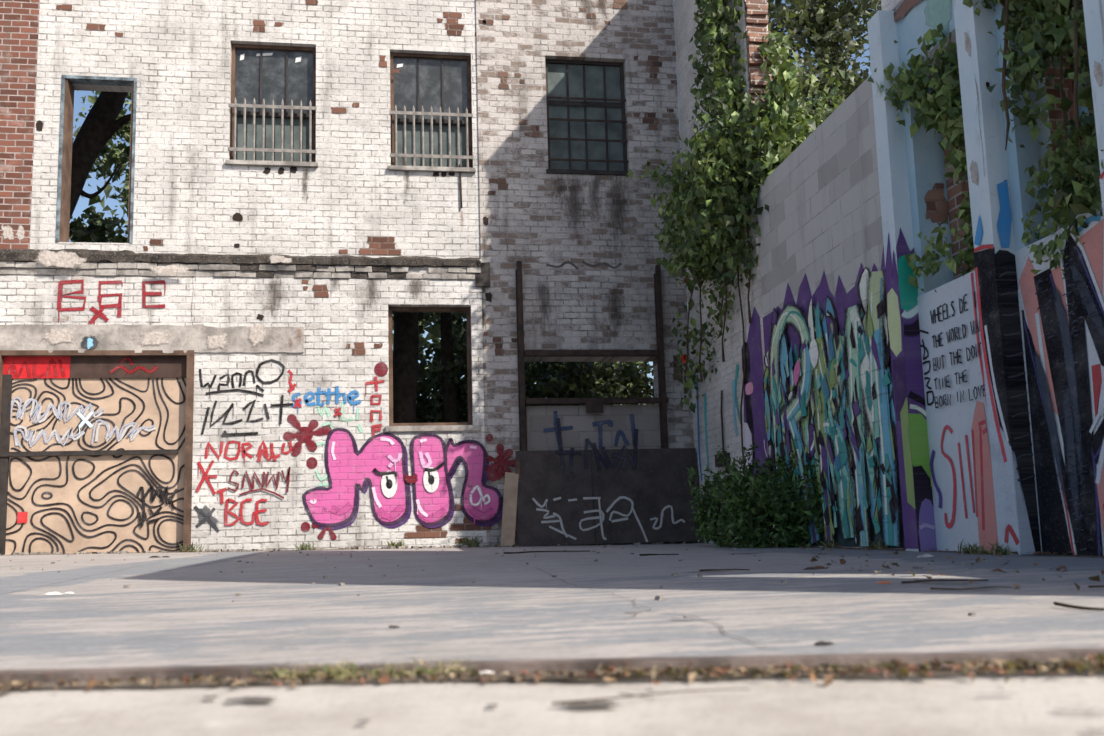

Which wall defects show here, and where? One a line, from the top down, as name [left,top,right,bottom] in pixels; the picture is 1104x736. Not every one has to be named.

flaking render [924,183,949,226]